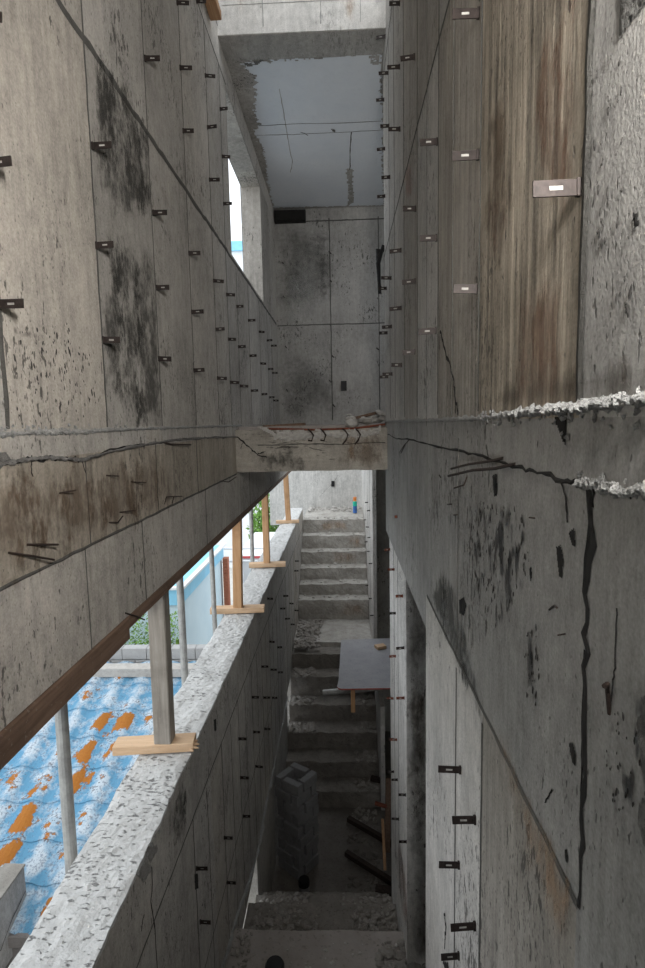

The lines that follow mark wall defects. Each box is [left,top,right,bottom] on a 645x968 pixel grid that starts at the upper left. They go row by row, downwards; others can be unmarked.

water stain [97,75,153,213]
spalling [0,323,242,439]
water stain [106,251,160,423]
crack [0,436,266,477]
spalling [258,385,645,445]
crack [388,434,645,910]
spalling [606,695,645,846]